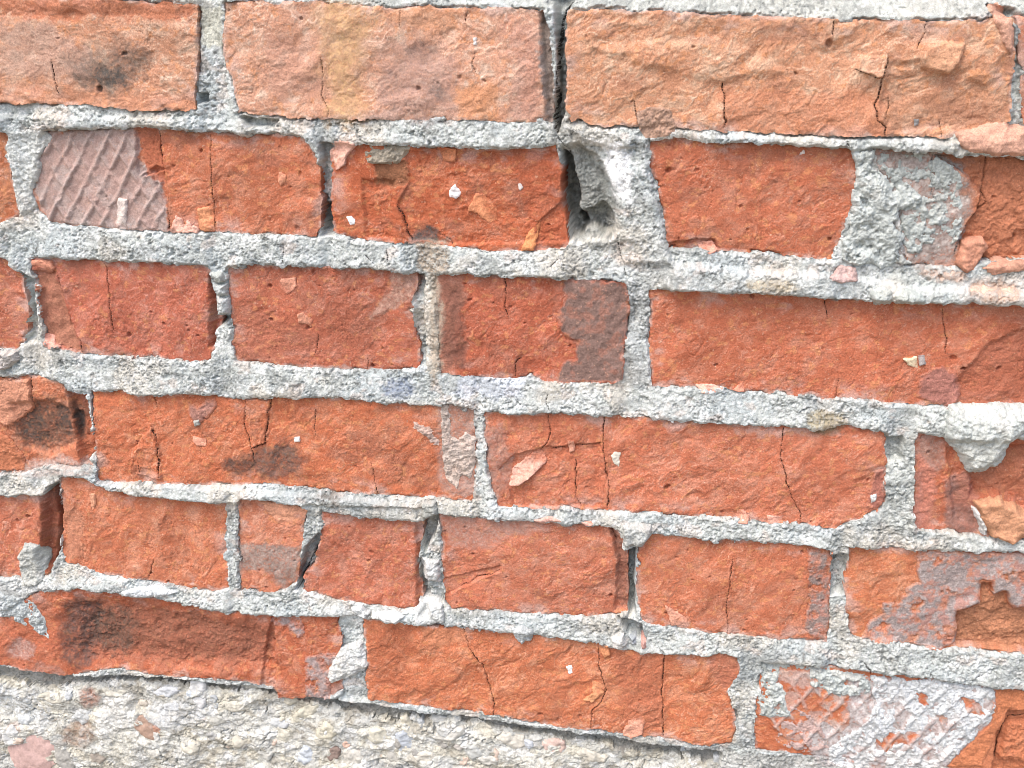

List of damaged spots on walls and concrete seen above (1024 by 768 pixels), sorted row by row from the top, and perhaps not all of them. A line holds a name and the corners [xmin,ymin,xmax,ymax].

spalling [986,2,1014,59]
crack [856,58,889,133]
peeling [115,197,128,229]
spalling [955,122,1024,275]
crack [244,399,272,461]
crack [541,395,617,539]
crack [780,426,801,526]
spalling [862,495,1024,655]
peeling [810,675,1024,768]